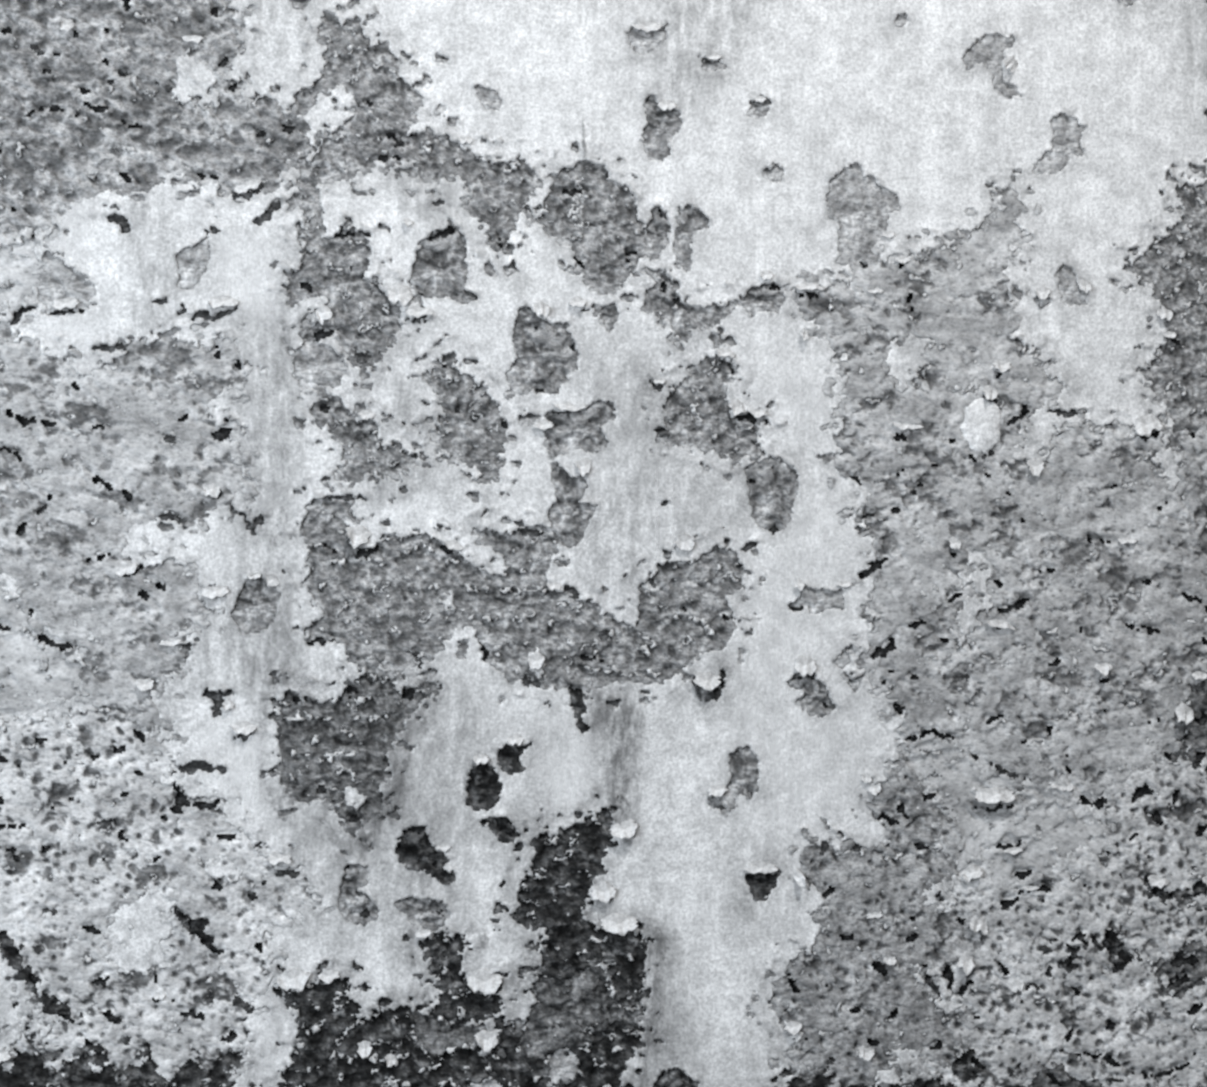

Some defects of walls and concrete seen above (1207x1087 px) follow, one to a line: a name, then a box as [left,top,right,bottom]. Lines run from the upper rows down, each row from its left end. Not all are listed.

peeling [0,219,286,744]
peeling [269,0,1207,902]